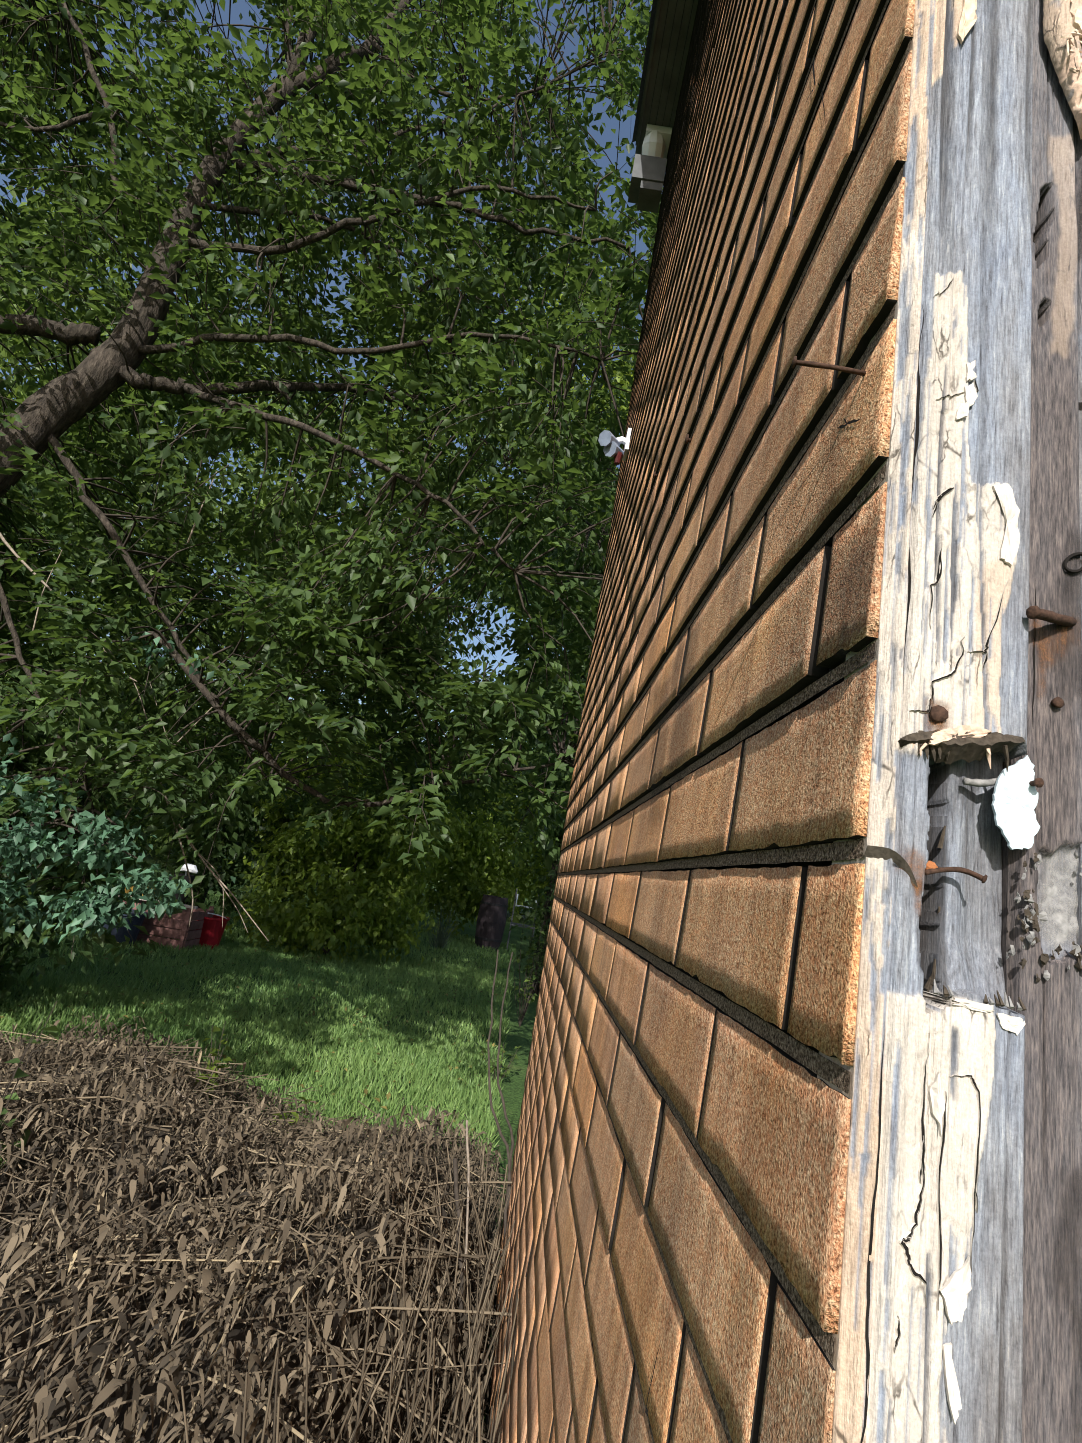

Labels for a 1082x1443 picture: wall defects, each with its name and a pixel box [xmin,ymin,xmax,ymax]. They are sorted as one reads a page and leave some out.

peeling [957,0,977,44]
peeling [1072,6,1082,39]
peeling [955,361,978,420]
peeling [992,483,1020,566]
rust [909,861,938,910]
peeling [991,755,1082,982]
peeling [928,1072,945,1137]
crack [861,1033,981,1443]
peeling [939,1256,972,1325]
peeling [942,1342,962,1424]